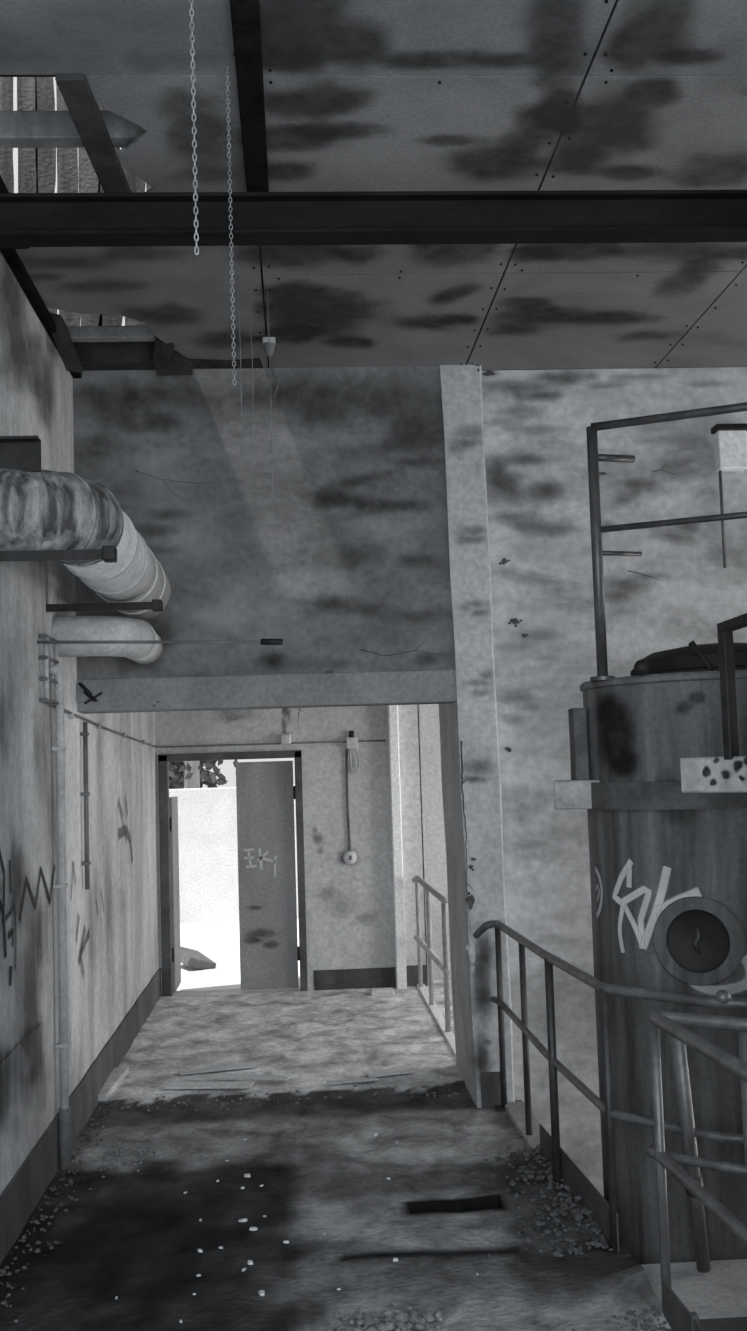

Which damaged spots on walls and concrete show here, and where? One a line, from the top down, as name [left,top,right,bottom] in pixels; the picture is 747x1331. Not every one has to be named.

leakage [260,0,576,77]
leakage [607,2,711,67]
leakage [264,89,366,178]
leakage [431,81,678,179]
leakage [245,245,369,265]
leakage [514,243,619,260]
leakage [260,284,372,347]
leakage [405,316,475,328]
leakage [434,287,473,303]
leakage [501,299,638,333]
leakage [0,911,43,1114]